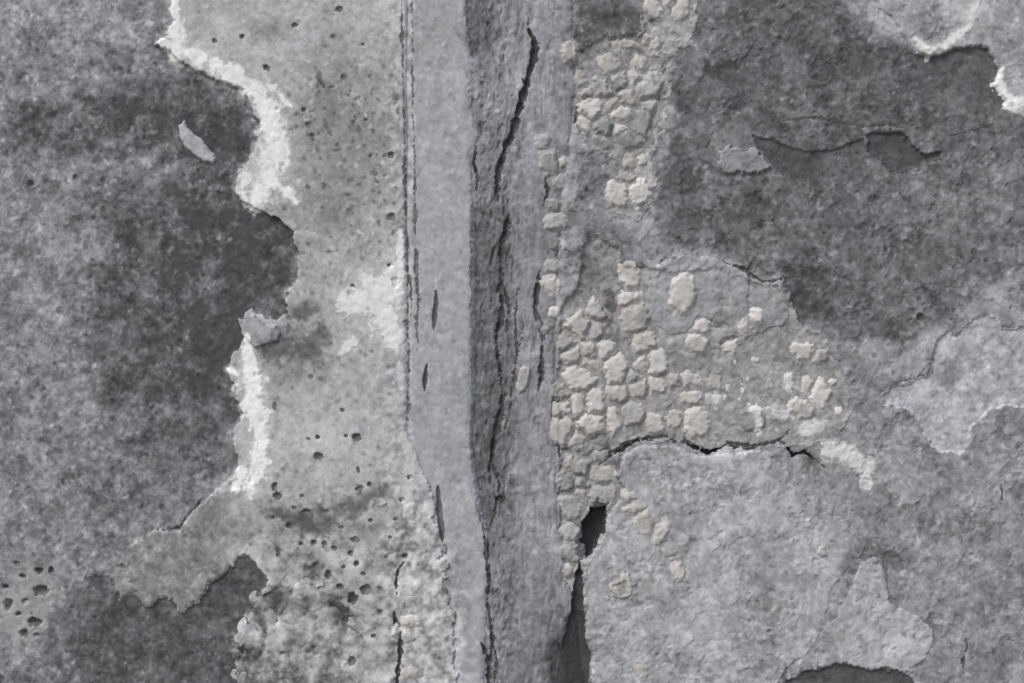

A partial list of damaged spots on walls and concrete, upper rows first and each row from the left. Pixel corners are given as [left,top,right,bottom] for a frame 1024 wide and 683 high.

crack [399,3,422,421]
spalling [559,0,699,222]
spalling [716,129,943,185]
peeling [869,0,1024,135]
leakage [913,0,981,63]
spalling [0,0,382,683]
crack [472,17,555,683]
crack [554,443,562,495]
crack [613,438,755,455]
peeling [550,233,933,683]
crack [780,431,825,468]